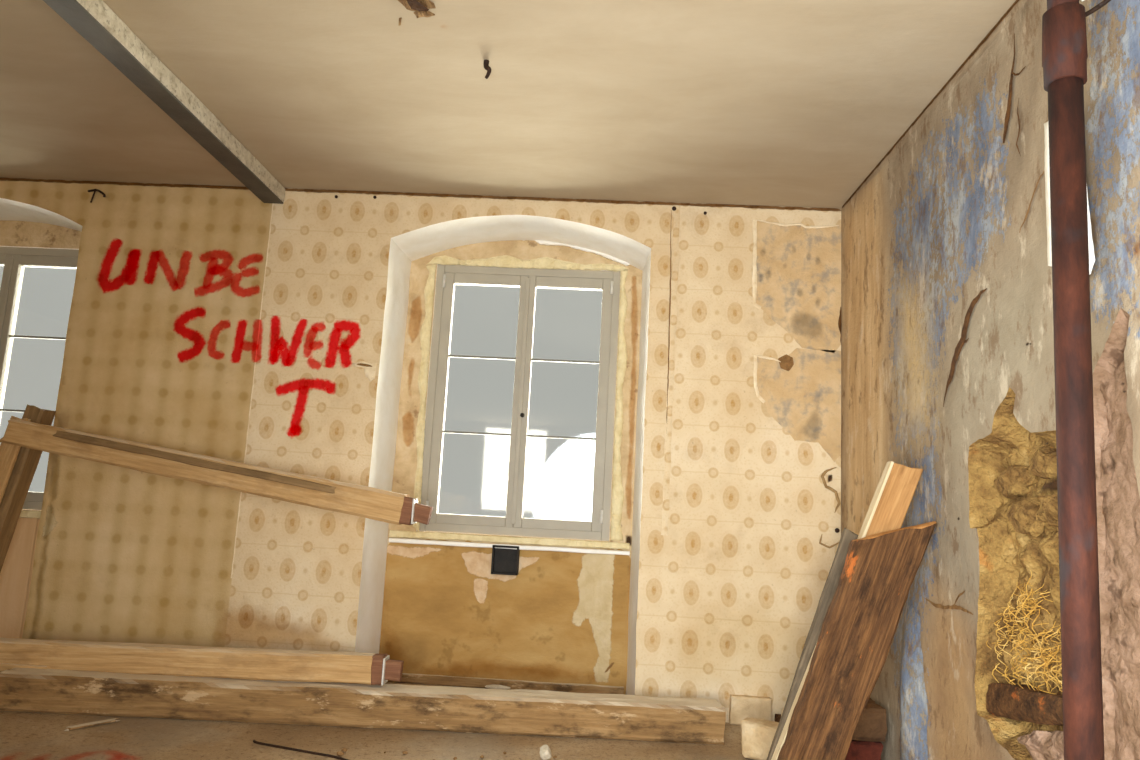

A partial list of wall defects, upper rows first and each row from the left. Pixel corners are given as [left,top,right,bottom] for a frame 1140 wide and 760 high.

spalling [398,0,436,25]
crack [0,178,248,189]
crack [244,0,1026,463]
crack [1019,170,1045,233]
peeling [1044,122,1052,266]
peeling [1087,193,1095,275]
crack [231,492,242,578]
peeling [572,553,615,683]
spalling [958,387,1064,760]
spalling [1093,308,1140,760]